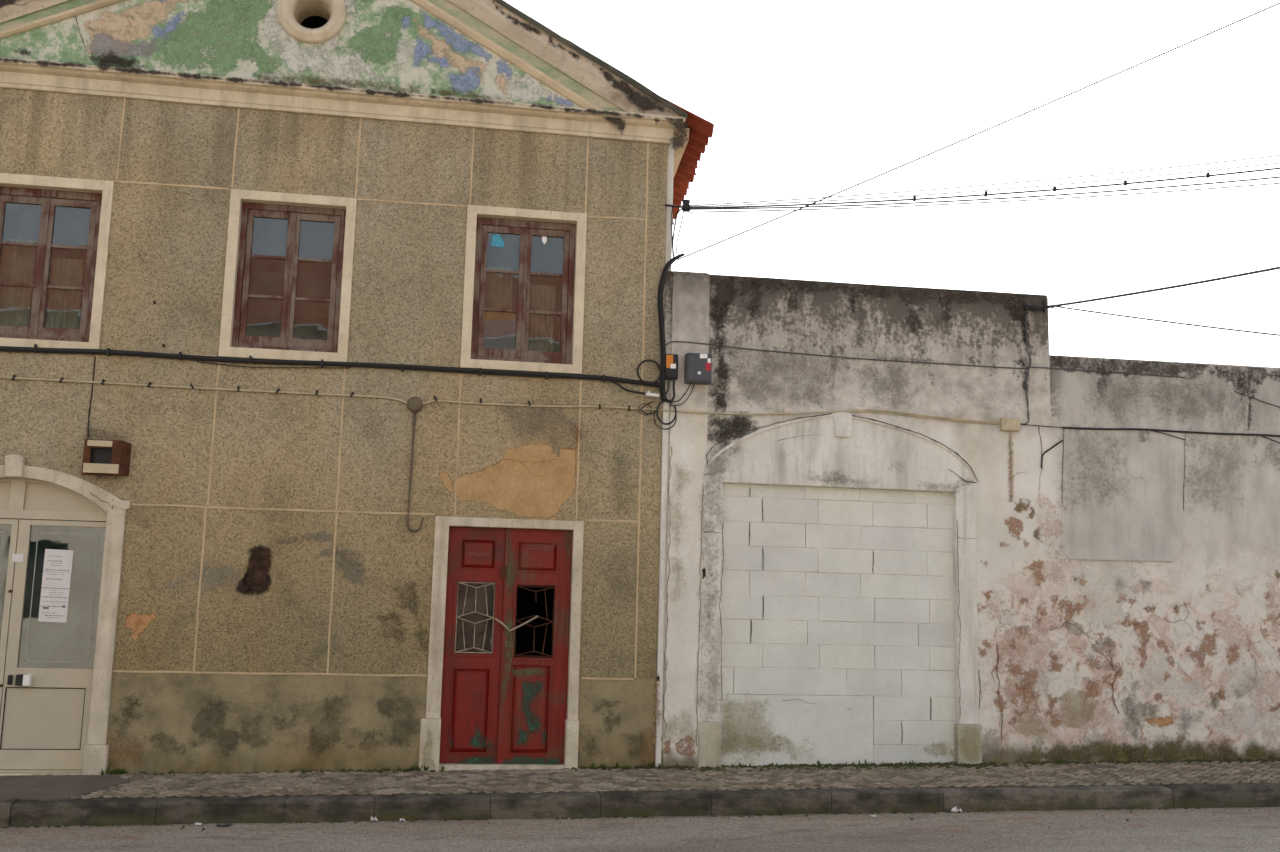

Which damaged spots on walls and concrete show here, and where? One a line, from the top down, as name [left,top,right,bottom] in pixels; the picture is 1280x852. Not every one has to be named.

peeling [84,0,573,106]
damp [707,277,1030,474]
damp [1051,356,1280,430]
peeling [440,441,581,520]
peeling [1000,495,1060,547]
peeling [448,614,562,765]
crack [901,525,1003,744]
peeling [994,626,1063,728]
peeling [1020,575,1088,622]
peeling [1117,595,1174,701]
peeling [1146,716,1176,727]
peeling [1187,613,1239,668]